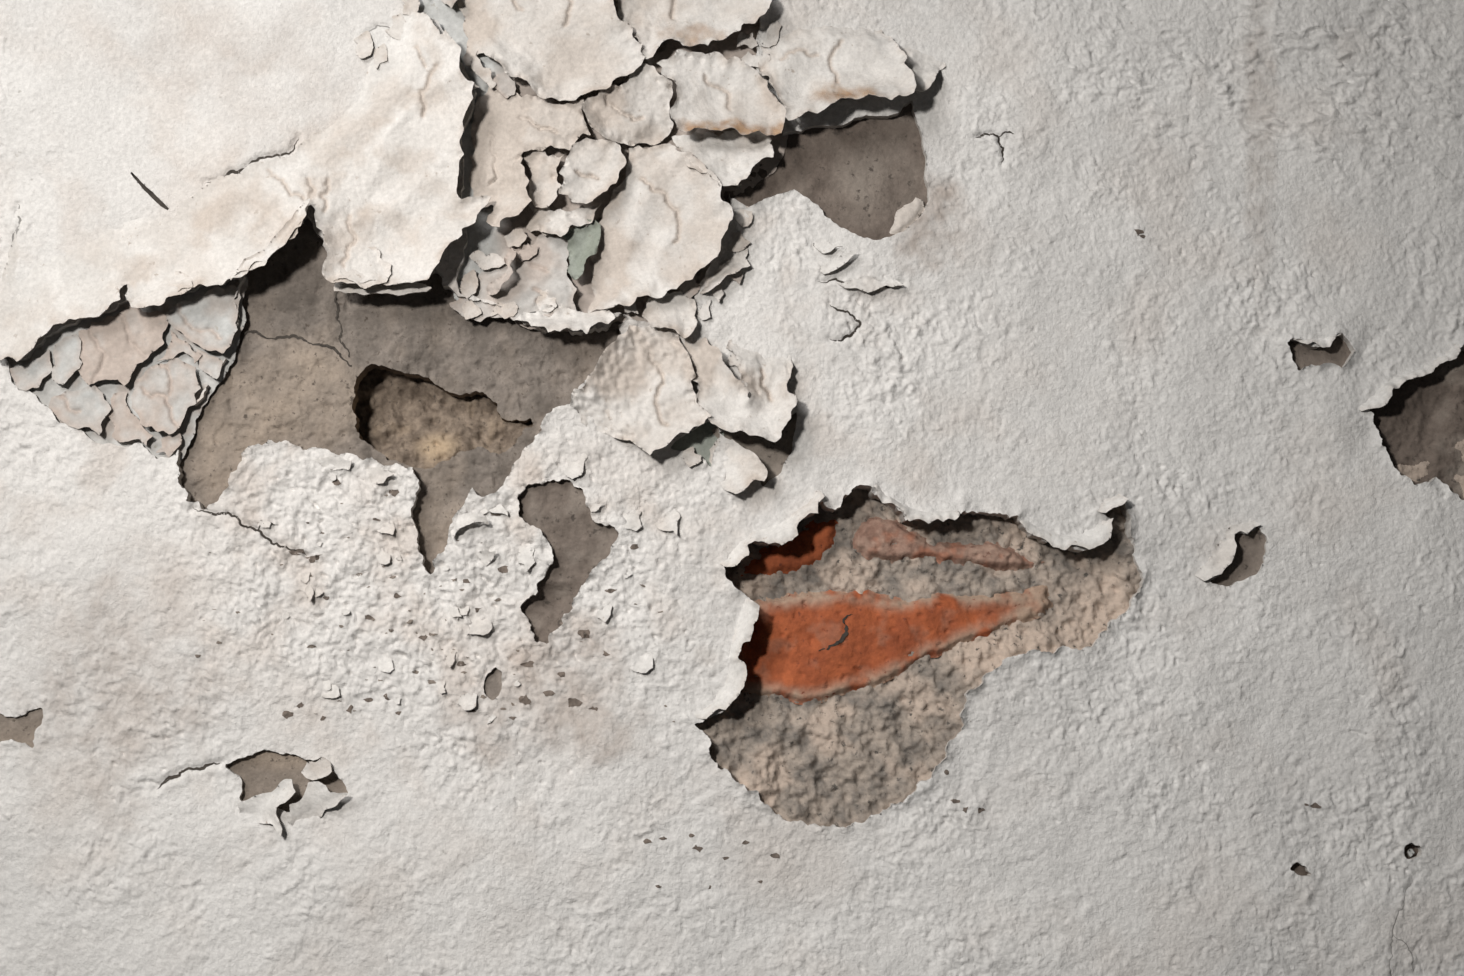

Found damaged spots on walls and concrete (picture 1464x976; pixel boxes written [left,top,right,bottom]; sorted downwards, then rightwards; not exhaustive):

peeling [0,0,946,724]
spalling [1288,333,1351,370]
spalling [1359,344,1464,500]
peeling [1195,520,1266,586]
spalling [695,485,1141,827]
spalling [0,708,43,748]
peeling [227,750,348,837]